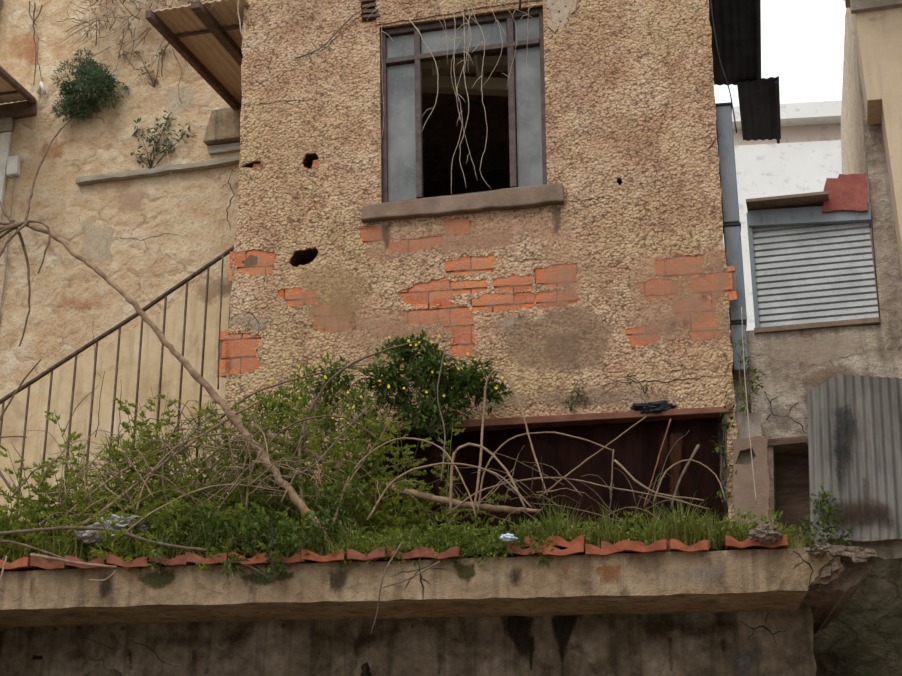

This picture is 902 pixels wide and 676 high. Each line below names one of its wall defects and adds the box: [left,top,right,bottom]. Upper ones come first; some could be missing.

flaking render [358,218,475,253]
flaking render [229,250,275,282]
flaking render [399,255,578,358]
flaking render [216,331,261,378]
flaking render [625,325,660,347]
spalling [810,556,867,586]
leakage [503,616,537,670]
leakage [552,615,581,662]